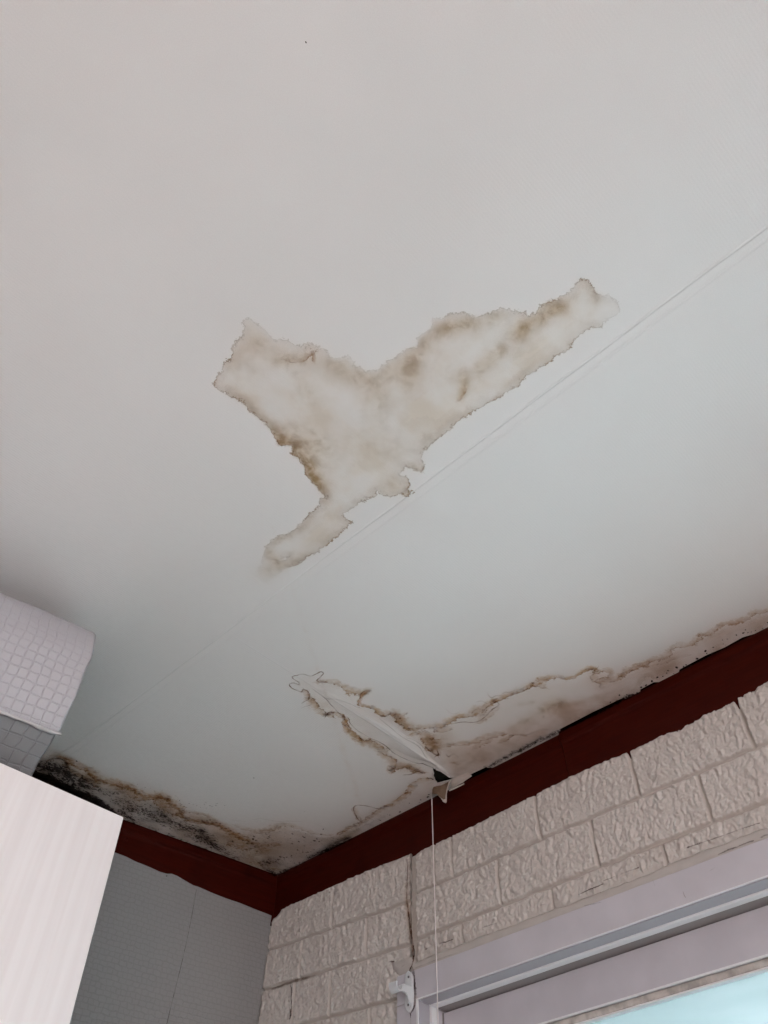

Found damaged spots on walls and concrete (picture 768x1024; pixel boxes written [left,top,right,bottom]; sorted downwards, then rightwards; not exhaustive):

water stain [476,647,714,774]
water stain [32,753,430,876]